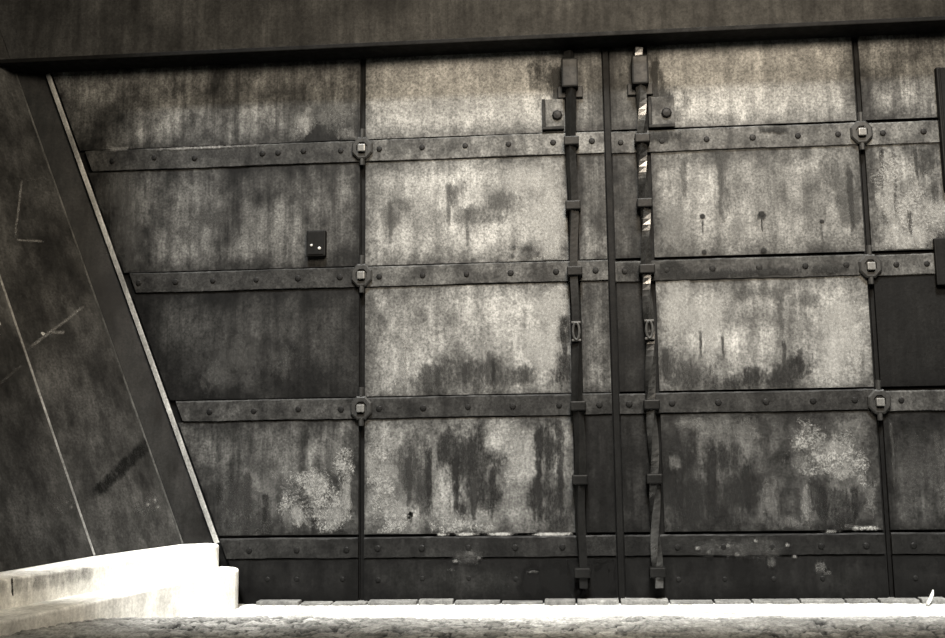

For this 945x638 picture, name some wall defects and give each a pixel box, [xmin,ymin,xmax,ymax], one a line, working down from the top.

leakage [447,185,513,239]
leakage [738,287,815,326]
leakage [394,340,533,393]
leakage [662,348,702,388]
leakage [724,342,811,389]
leakage [398,424,503,521]
leakage [528,418,570,536]
leakage [665,430,761,531]